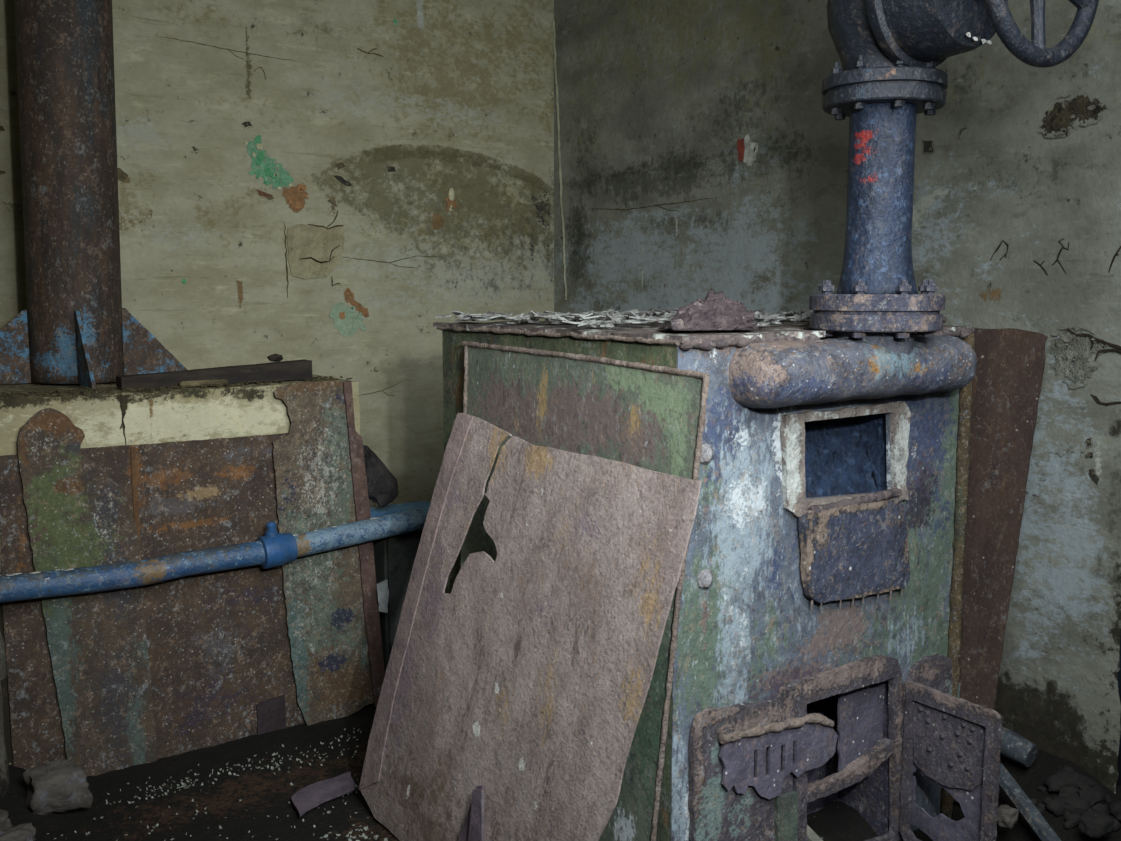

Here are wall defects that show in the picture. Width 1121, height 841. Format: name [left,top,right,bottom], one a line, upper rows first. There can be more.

spalling [1038,95,1106,139]
peeling [241,121,309,213]
crack [284,212,438,298]
water stain [529,188,551,261]
peeling [344,287,369,318]
water stain [994,671,1106,783]